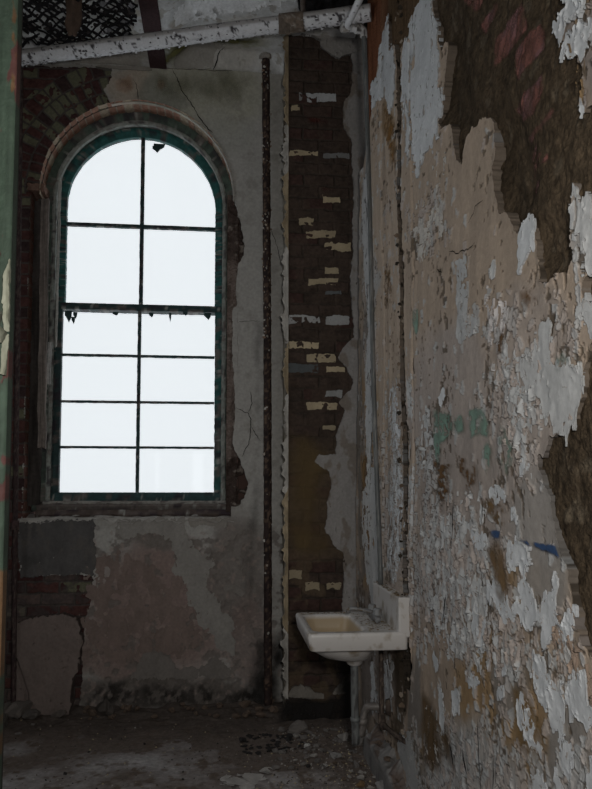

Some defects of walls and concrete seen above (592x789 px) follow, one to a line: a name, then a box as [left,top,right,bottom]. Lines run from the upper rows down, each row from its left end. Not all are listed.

spalling [0,0,296,705]
crack [168,49,232,133]
crack [239,392,259,454]
peeling [370,654,394,720]
spalling [280,0,592,700]
peeling [387,254,592,789]